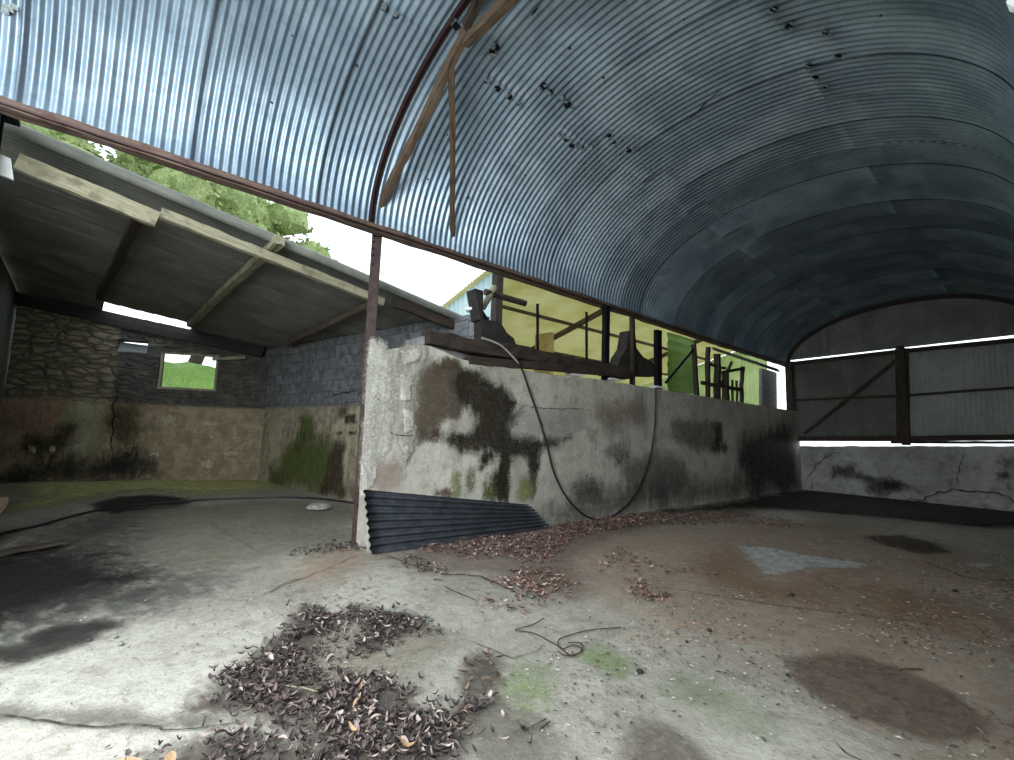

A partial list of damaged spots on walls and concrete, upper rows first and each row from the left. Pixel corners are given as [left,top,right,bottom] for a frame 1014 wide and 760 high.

crack [110,386,130,449]
water stain [414,358,571,503]
water stain [0,447,157,483]
water stain [320,440,355,498]
water stain [664,423,1014,528]
crack [906,454,1014,502]
water stain [0,495,190,631]
water stain [867,535,951,553]
crack [2,713,236,730]
water stain [786,653,985,738]